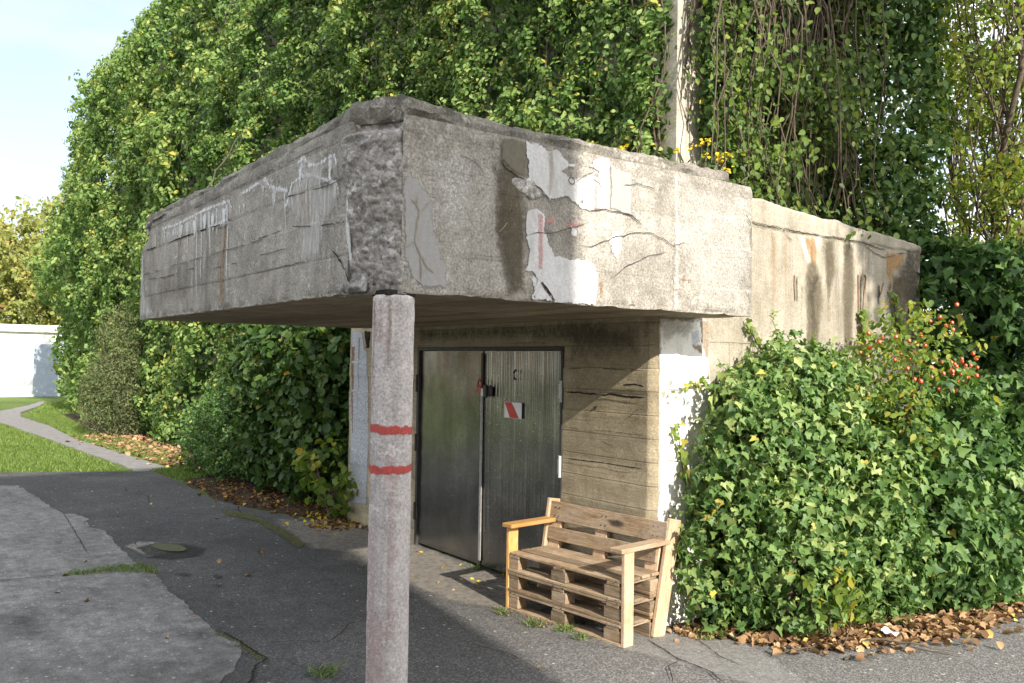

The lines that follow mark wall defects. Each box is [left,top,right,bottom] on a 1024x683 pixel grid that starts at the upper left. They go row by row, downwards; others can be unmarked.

efflorescence [155,153,352,297]
damp [497,158,523,291]
peeling [512,141,610,305]
crack [530,209,689,273]
peeling [609,231,621,262]
corrosion [799,236,820,270]